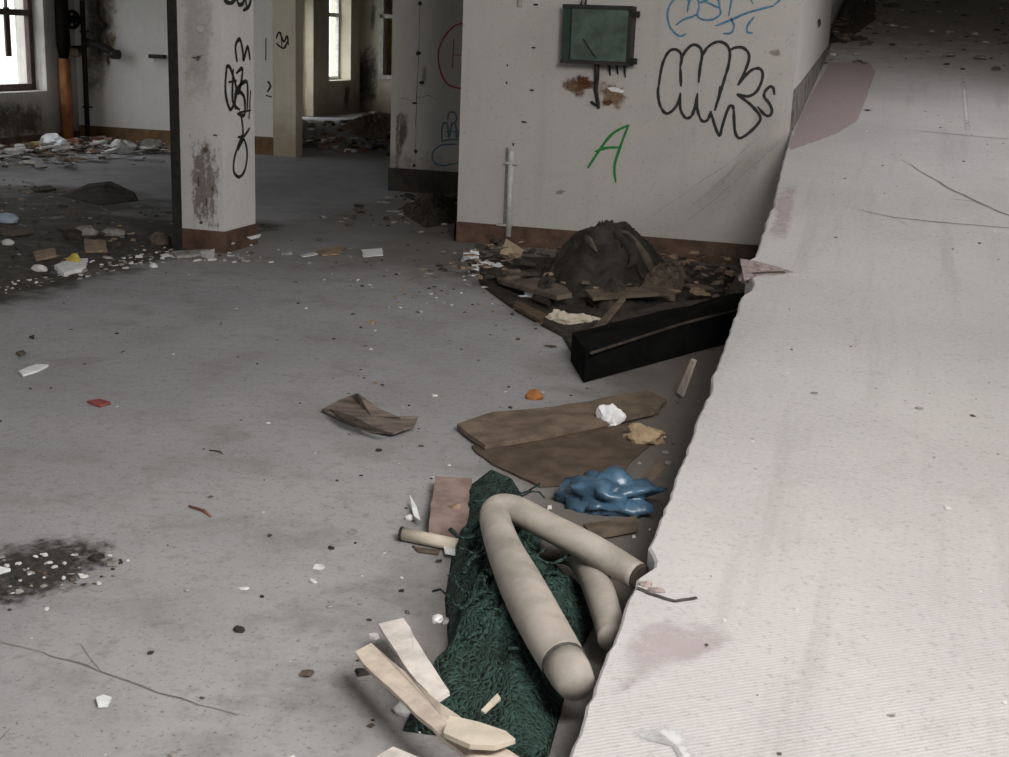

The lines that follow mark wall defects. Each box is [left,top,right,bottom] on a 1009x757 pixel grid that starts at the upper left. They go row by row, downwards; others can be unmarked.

leakage [0,104,41,137]